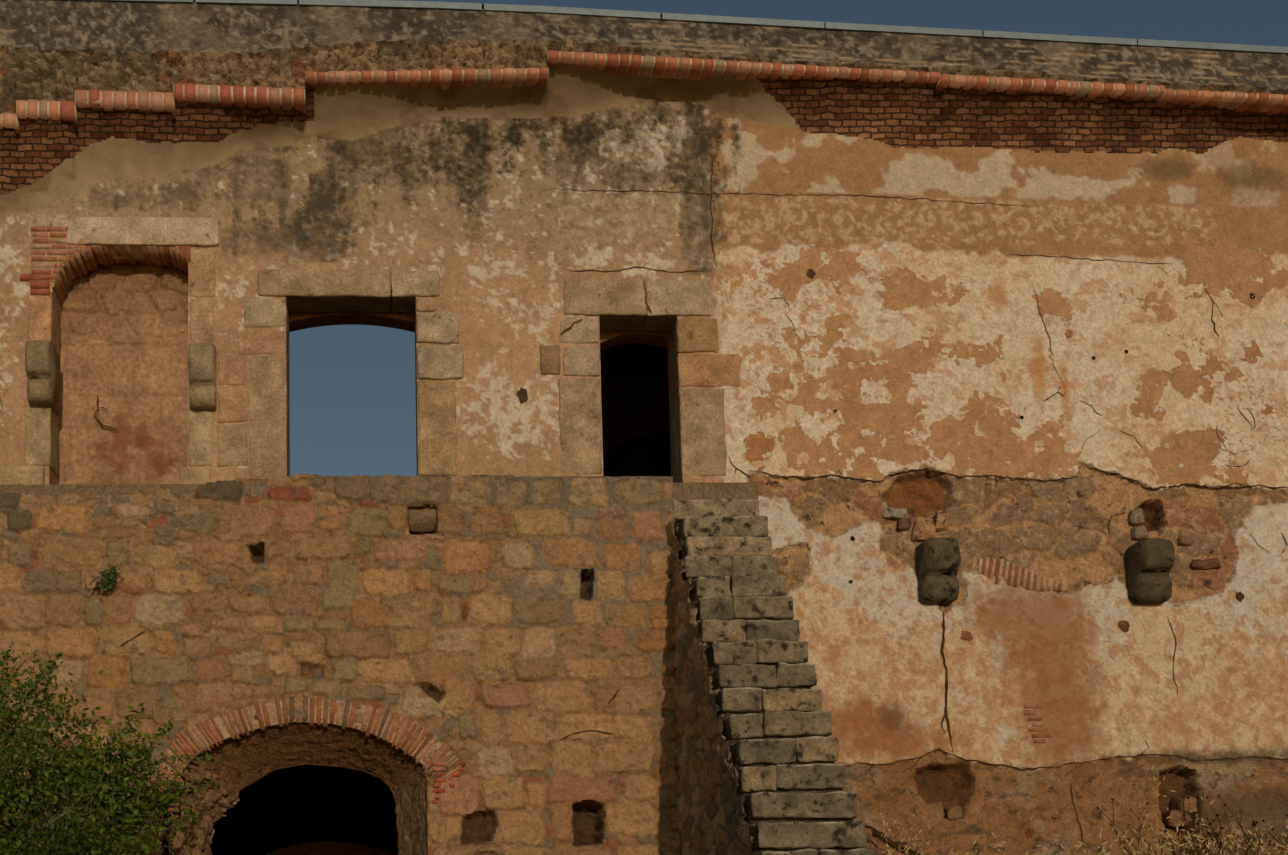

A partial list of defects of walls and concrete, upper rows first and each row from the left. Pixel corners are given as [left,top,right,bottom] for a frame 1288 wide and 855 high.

water stain [233,141,386,262]
peeling [517,387,528,404]
spalling [742,235,1288,614]
peeling [1118,620,1130,632]
flaking render [1024,705,1052,743]
crack [847,612,1288,846]